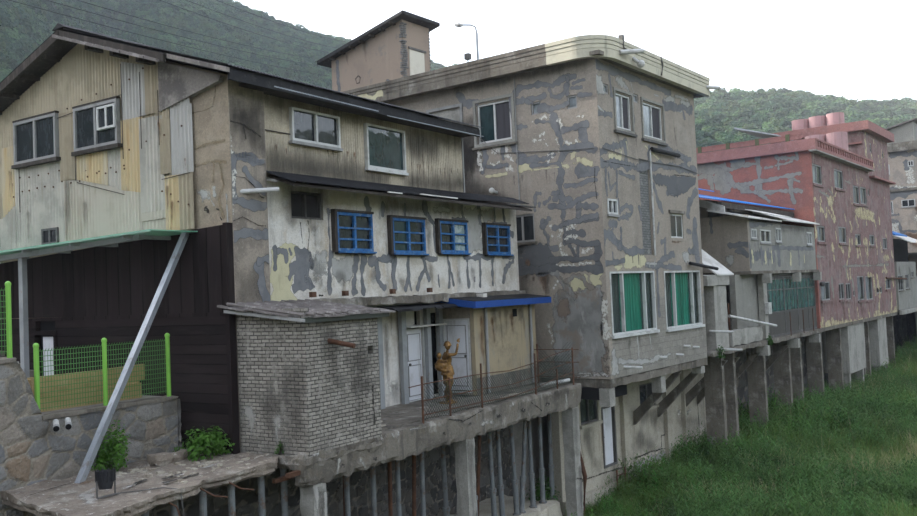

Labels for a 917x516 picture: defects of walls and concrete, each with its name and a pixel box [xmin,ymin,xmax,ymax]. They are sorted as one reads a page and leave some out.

peeling [532,114,578,171]
peeling [204,169,237,222]
peeling [813,179,899,328]